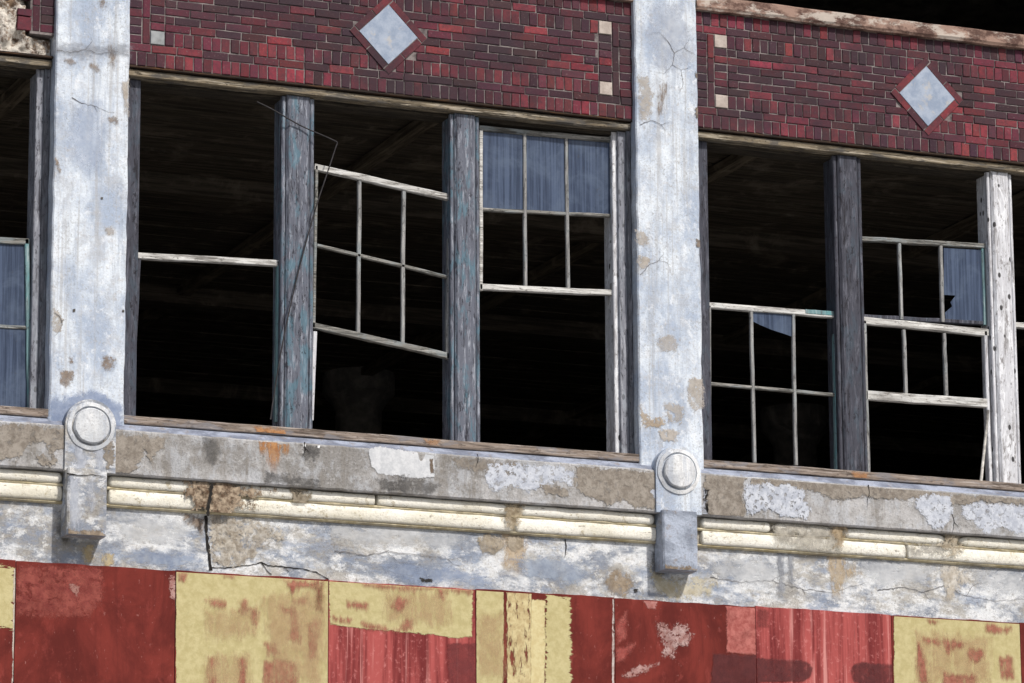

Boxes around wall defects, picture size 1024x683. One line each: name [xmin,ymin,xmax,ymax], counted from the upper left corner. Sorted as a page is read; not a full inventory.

rust [255,427,289,462]
peeling [640,377,705,443]
spalling [181,480,285,570]
crack [204,484,329,580]
peeling [477,463,656,555]
peeling [697,475,1024,558]